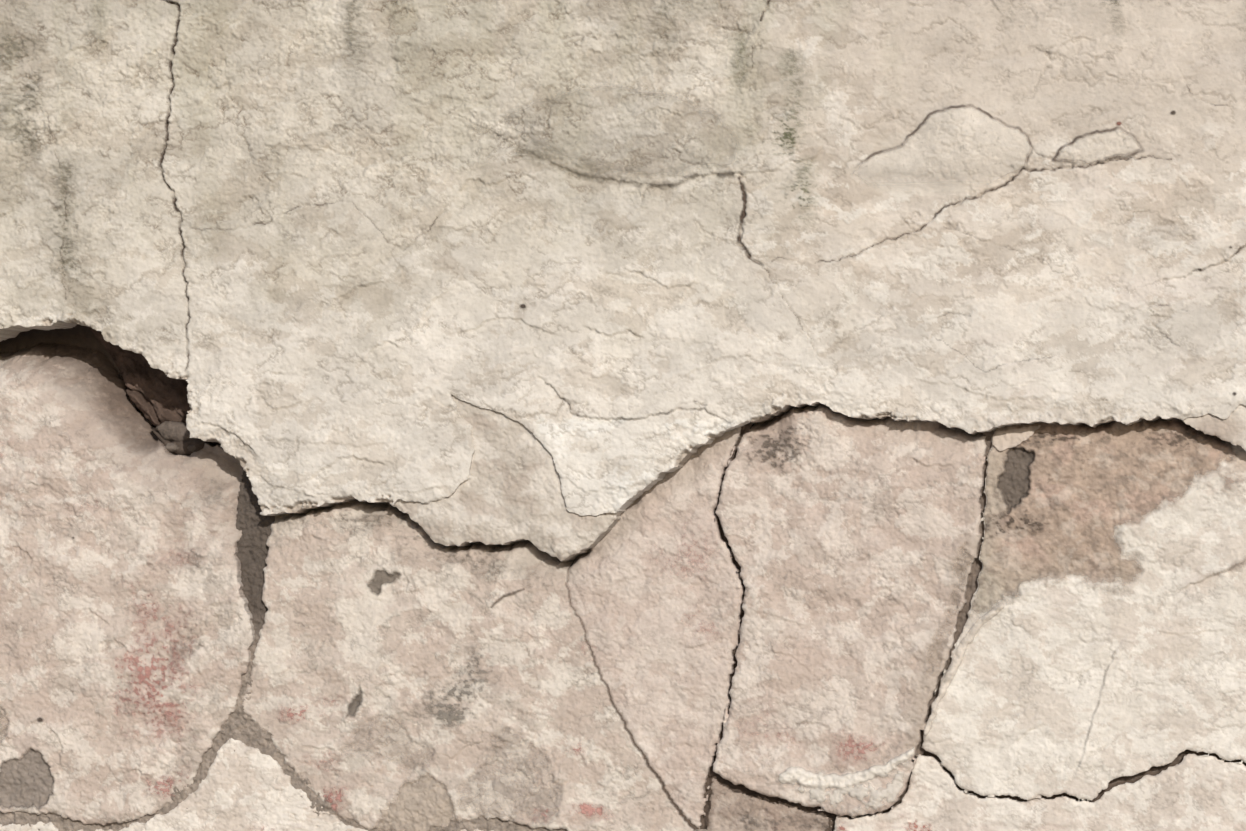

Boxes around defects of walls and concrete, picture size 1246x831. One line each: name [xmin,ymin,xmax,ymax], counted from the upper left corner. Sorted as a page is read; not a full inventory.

crack [160,1,190,368]
crack [737,177,769,273]
crack [821,154,1155,262]
spalling [89,327,212,455]
flaking render [395,395,625,561]
spalling [368,570,400,595]
crack [568,422,1246,831]
peeling [924,392,1246,736]
spalling [0,749,54,809]
peeling [347,690,561,831]
peeling [779,748,915,809]